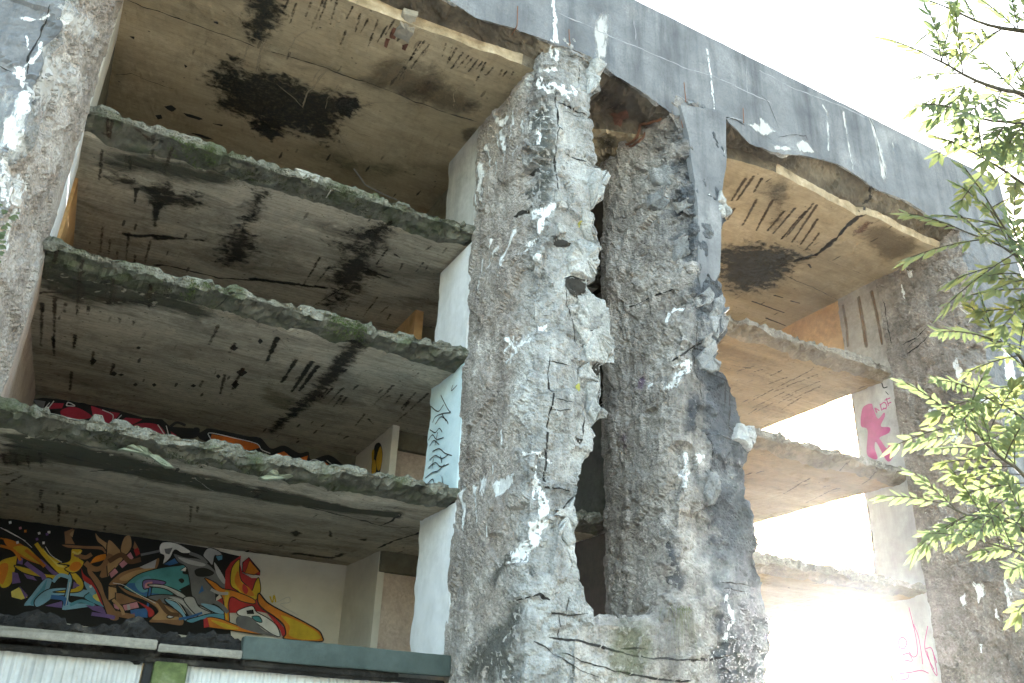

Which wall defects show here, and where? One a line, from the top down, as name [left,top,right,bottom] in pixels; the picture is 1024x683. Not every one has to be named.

peeling [294,168,320,184]
leakage [202,0,472,166]
crack [560,13,886,299]
spalling [743,108,775,136]
spalling [774,140,814,153]
leakage [248,221,395,311]
spalling [565,278,586,299]
leakage [719,241,814,296]
leakage [269,334,368,433]
crack [543,276,598,516]
peeling [118,444,174,469]
crack [509,592,733,683]